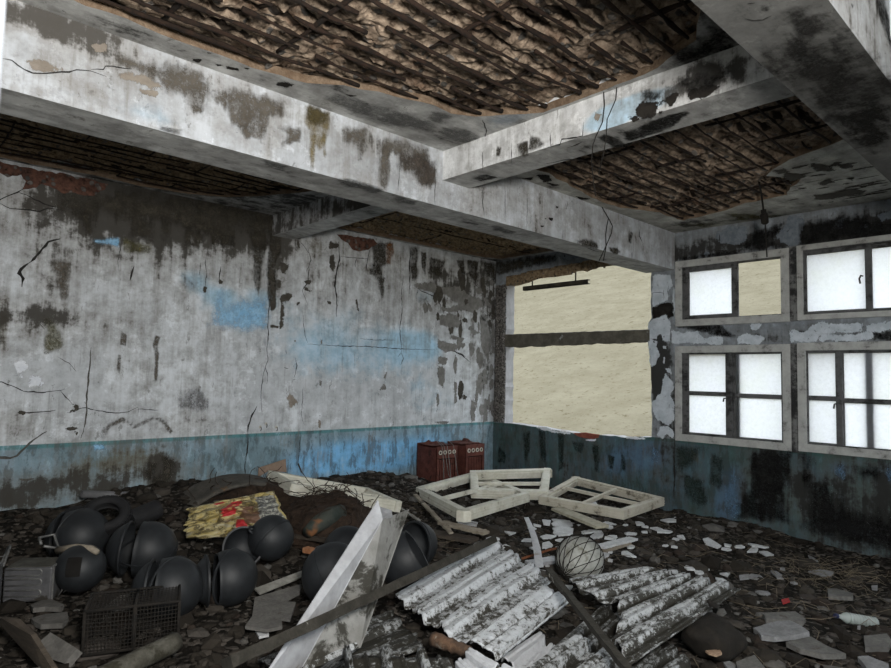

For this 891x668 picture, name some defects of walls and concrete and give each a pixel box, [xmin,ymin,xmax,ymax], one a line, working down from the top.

spalling [98,0,699,115]
spalling [0,113,304,196]
spalling [522,96,891,219]
crack [17,239,59,287]
water stain [53,262,71,299]
water stain [60,190,281,308]
water stain [370,243,387,296]
water stain [410,248,445,279]
crack [0,350,152,459]
peeling [414,269,507,423]
peeling [648,274,723,439]
water stain [676,446,722,506]